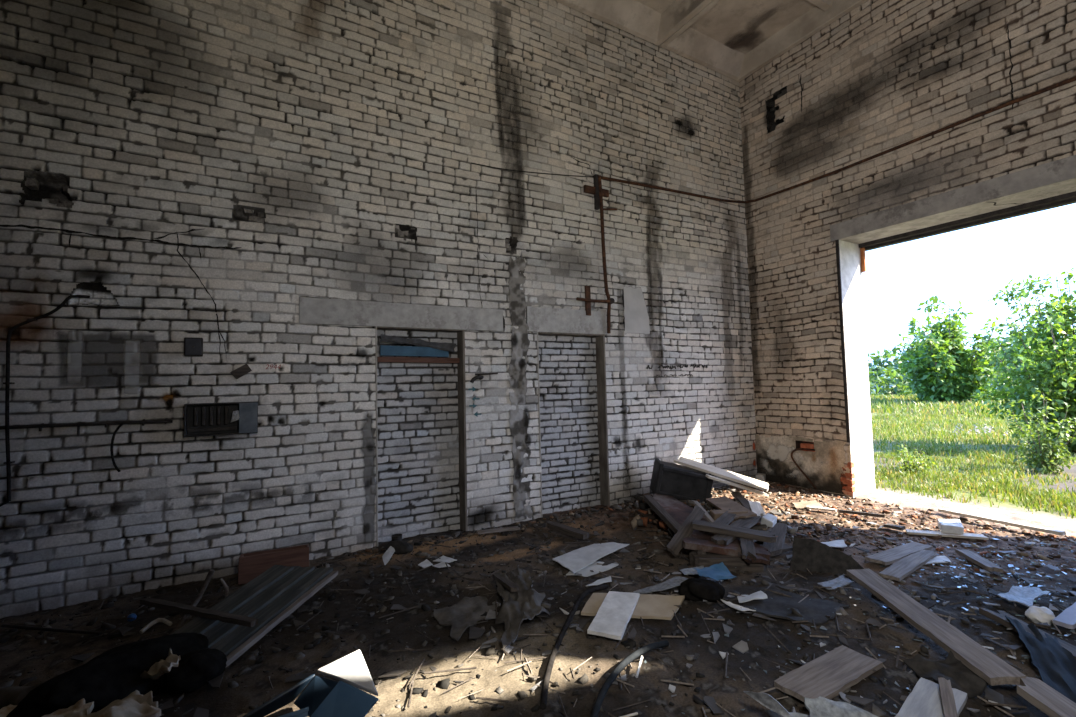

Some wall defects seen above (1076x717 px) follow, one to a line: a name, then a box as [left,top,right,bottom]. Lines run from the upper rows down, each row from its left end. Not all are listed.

water stain [495,43,504,152]
spalling [18,170,76,208]